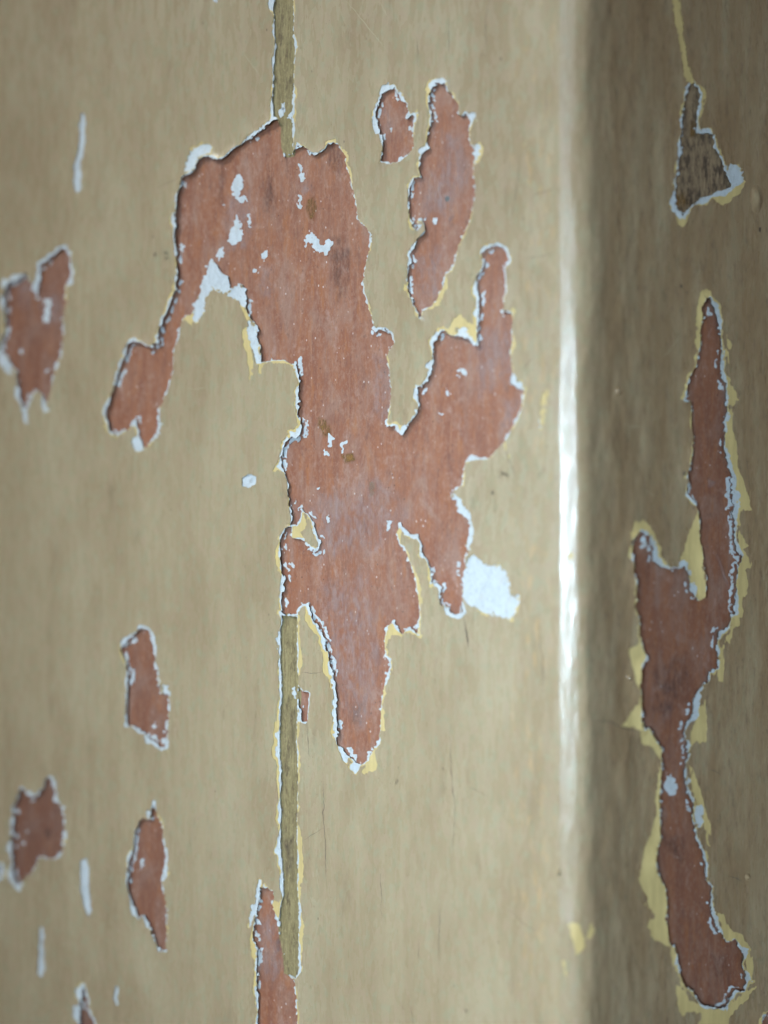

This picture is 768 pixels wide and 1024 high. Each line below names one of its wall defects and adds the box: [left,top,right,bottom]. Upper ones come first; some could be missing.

peeling [669,0,746,227]
peeling [0,245,75,424]
peeling [101,77,527,775]
peeling [621,289,757,1024]
peeling [0,776,67,892]
peeling [72,982,97,1024]
peeling [125,799,170,953]
peeling [247,878,300,1024]